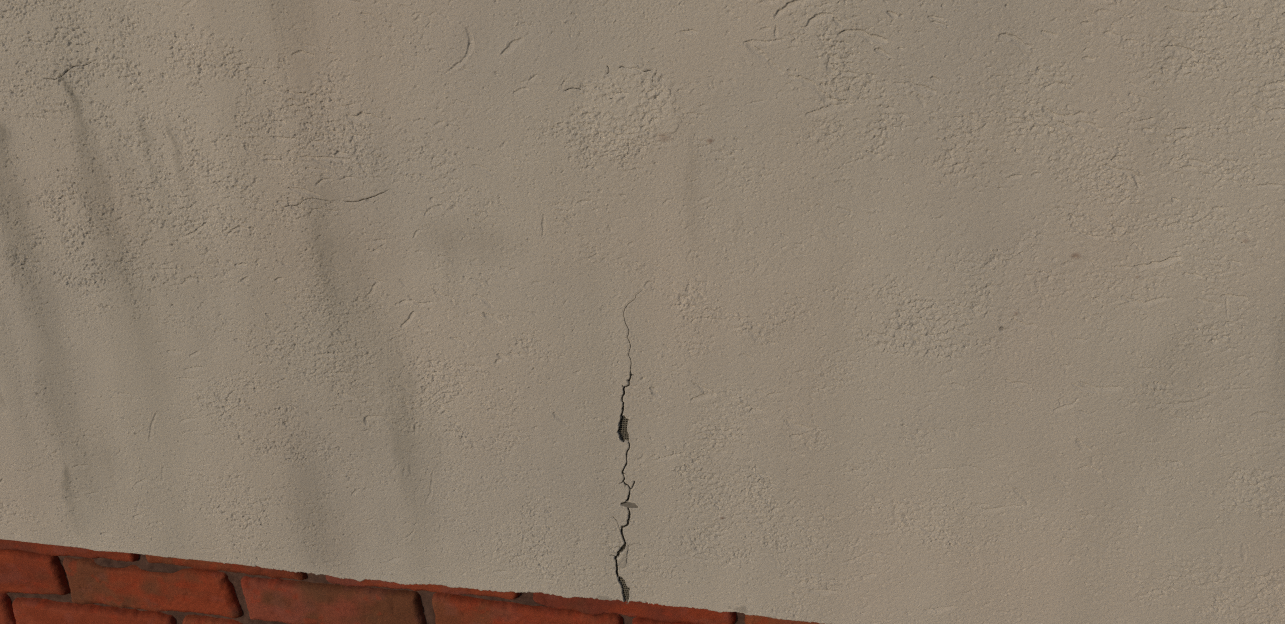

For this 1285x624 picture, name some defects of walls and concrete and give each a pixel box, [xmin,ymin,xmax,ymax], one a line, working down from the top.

crack [610,291,641,576]